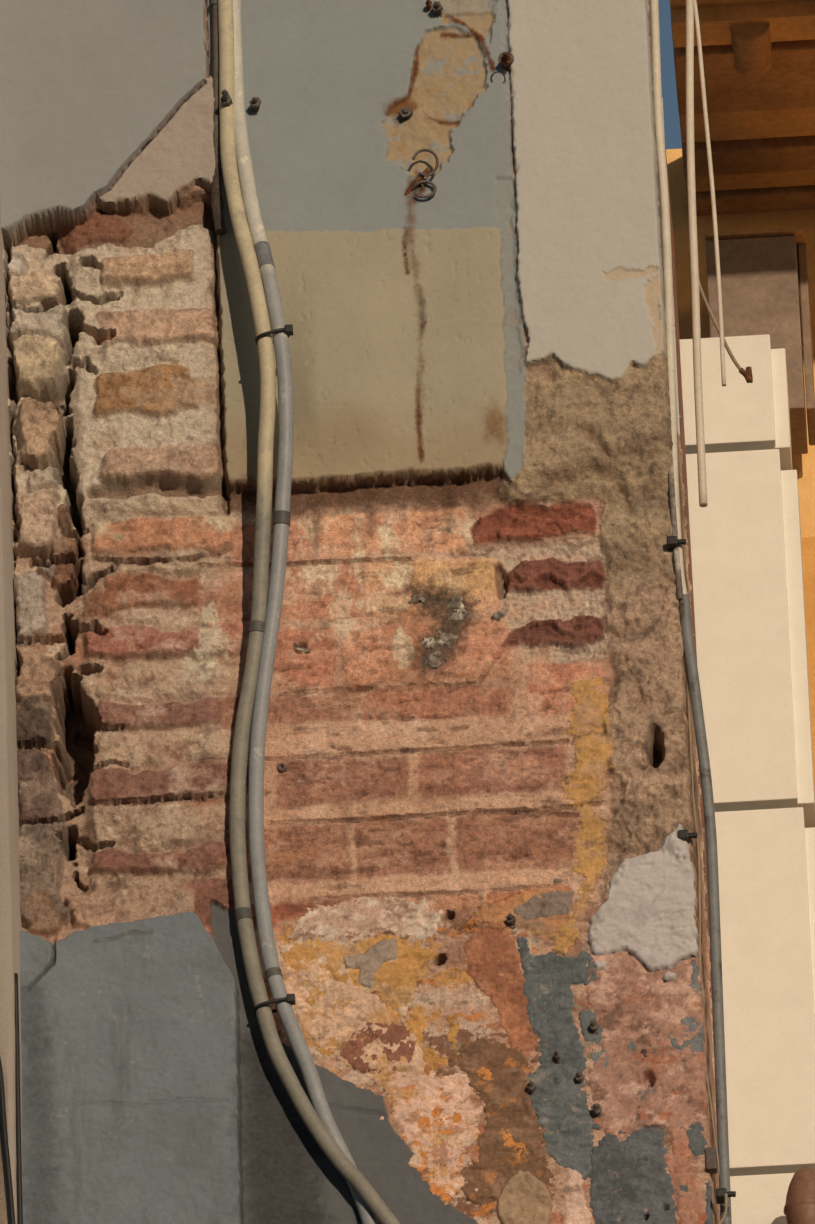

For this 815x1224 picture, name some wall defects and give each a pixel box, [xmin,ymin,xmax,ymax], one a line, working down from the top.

corrosion [388,48,419,114]
corrosion [441,17,496,70]
spalling [3,76,256,943]
spalling [245,722,290,1046]
crack [1,79,608,893]
leakage [407,586,473,673]
spalling [264,265,720,1224]
leakage [491,610,506,621]